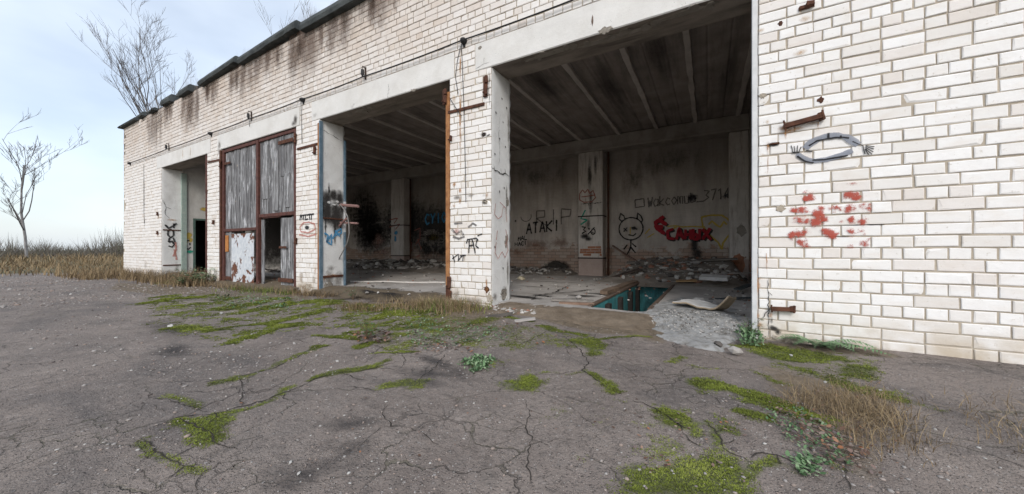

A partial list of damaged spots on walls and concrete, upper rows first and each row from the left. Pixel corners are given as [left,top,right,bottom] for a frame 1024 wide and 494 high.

water stain [292,29,330,60]
water stain [325,190,384,247]
crack [140,335,445,490]
crack [514,396,548,488]